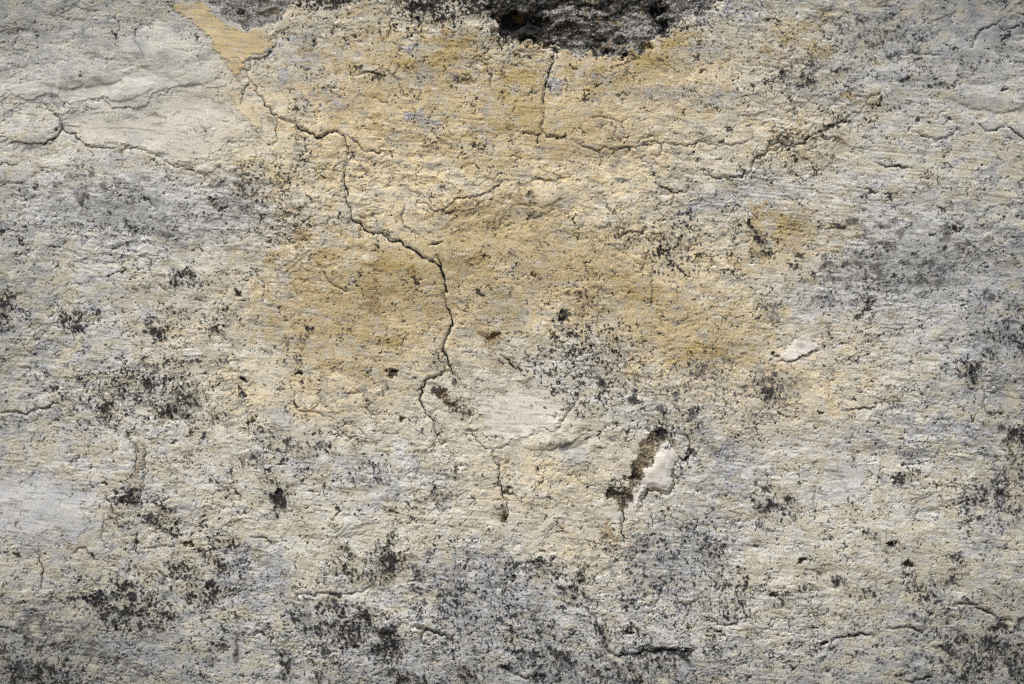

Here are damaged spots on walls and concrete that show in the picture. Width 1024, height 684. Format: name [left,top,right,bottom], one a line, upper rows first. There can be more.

flaking render [487,0,724,61]
crack [0,109,209,177]
crack [231,44,563,446]
crack [472,435,510,523]
peeling [606,428,679,514]